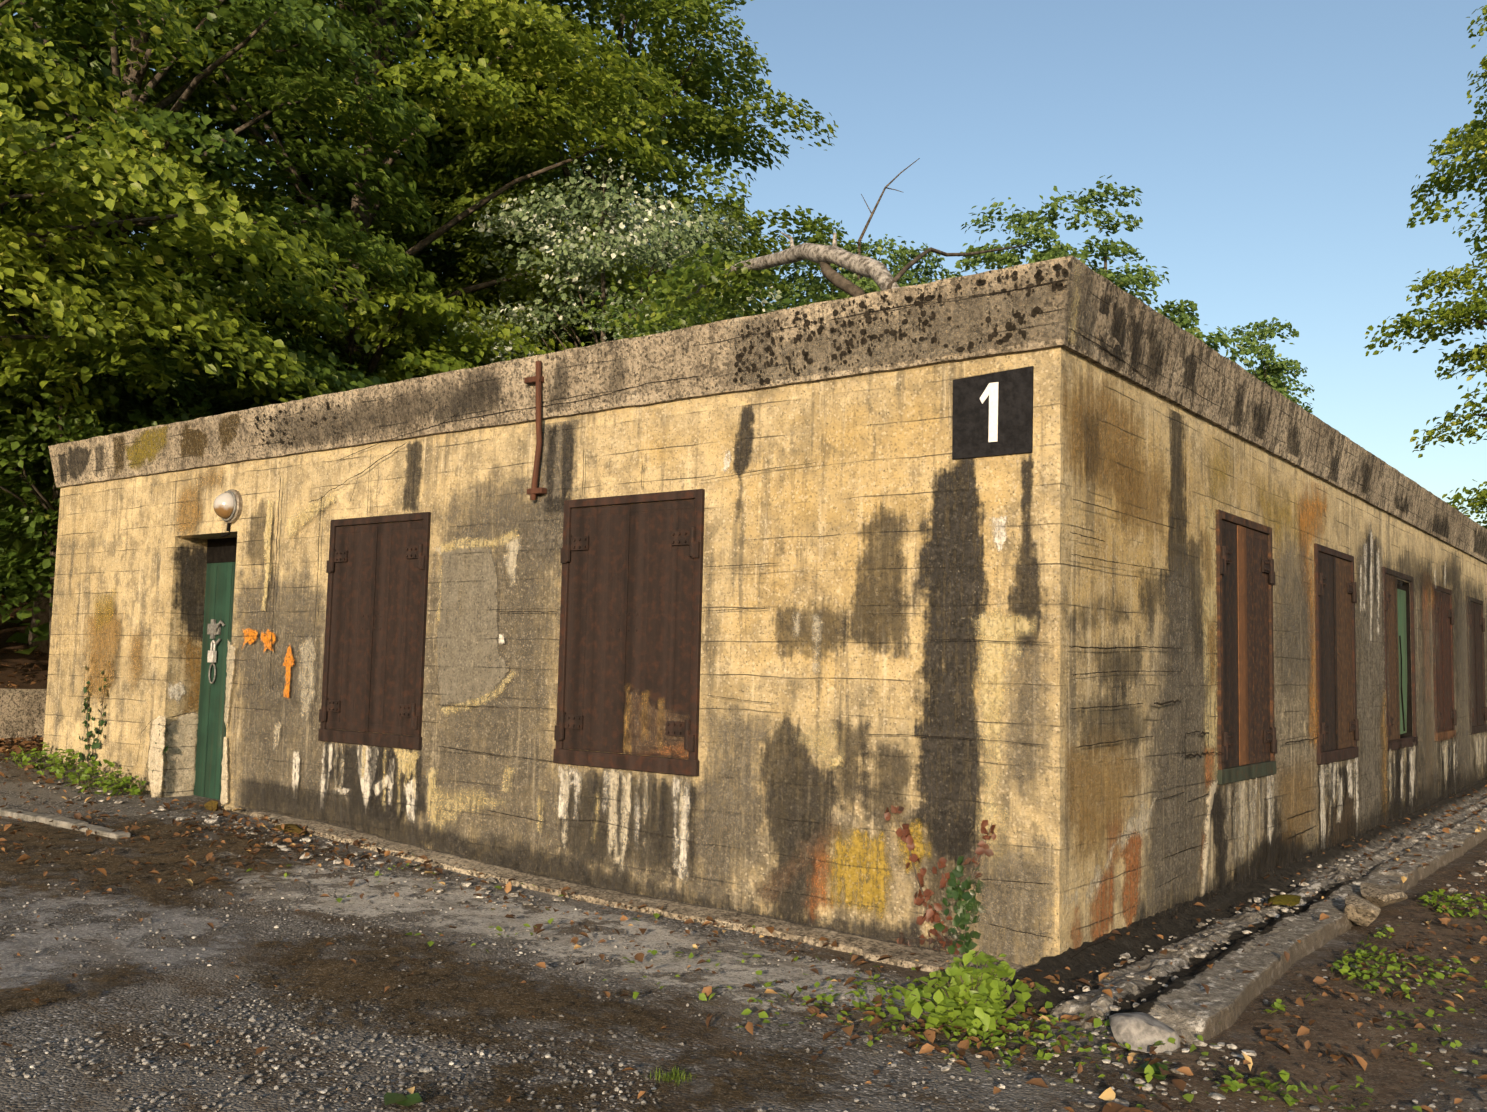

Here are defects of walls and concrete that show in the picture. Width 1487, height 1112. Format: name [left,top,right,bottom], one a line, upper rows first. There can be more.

damp [724,405,754,476]
damp [1069,264,1163,377]
damp [1184,354,1197,392]
damp [1232,385,1270,439]
damp [233,419,1055,967]
damp [1076,410,1487,932]
rust [1072,827,1142,949]